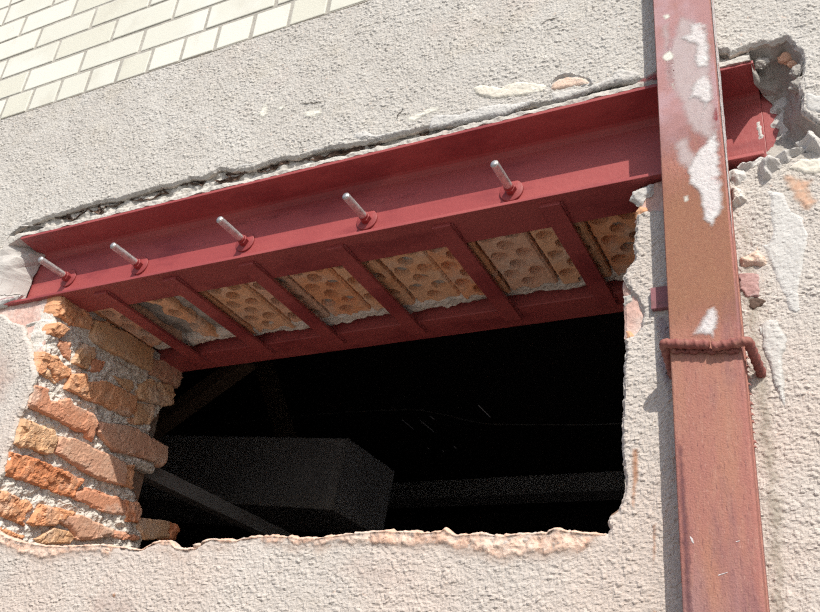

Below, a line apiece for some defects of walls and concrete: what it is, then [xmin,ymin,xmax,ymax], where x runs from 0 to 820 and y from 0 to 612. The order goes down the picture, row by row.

corrosion [654,0,720,147]
spalling [719,40,820,157]
crack [36,143,381,226]
flaking render [790,158,820,176]
corrosion [664,190,735,307]
spalling [0,295,51,339]
spalling [623,282,644,340]
spalling [0,527,607,559]